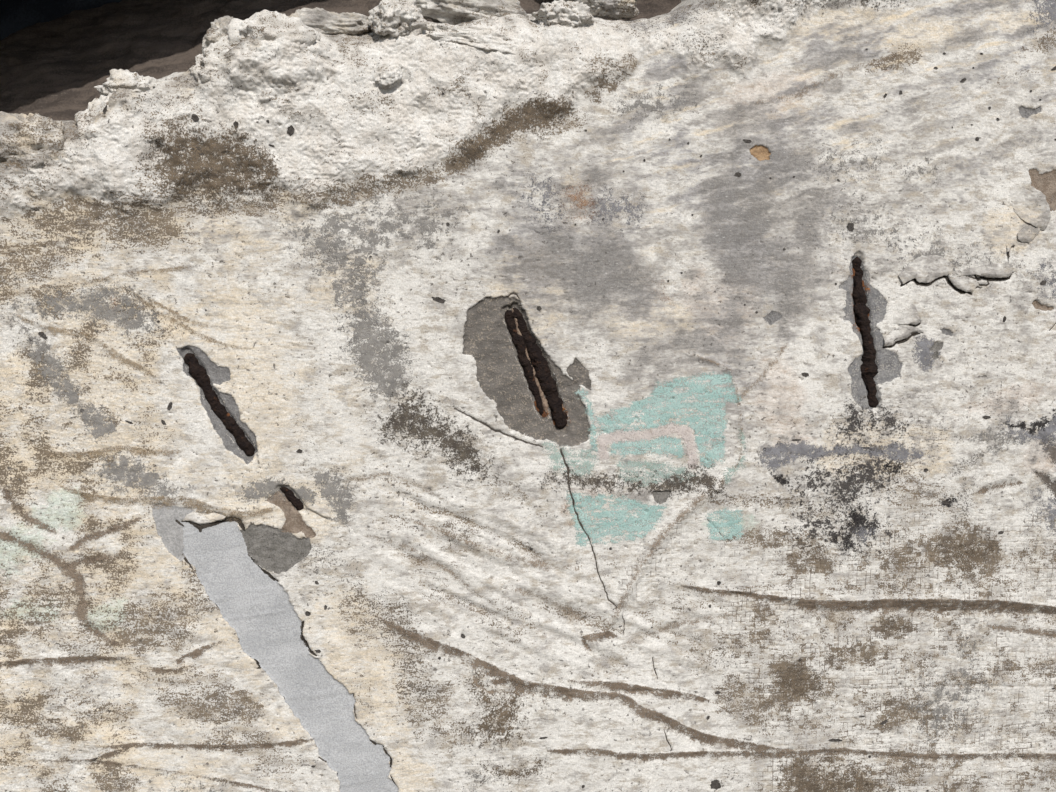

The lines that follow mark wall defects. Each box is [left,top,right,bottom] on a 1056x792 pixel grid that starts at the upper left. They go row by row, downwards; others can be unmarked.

spalling [743,139,771,161]
peeling [898,169,1056,292]
spalling [177,345,258,464]
spalling [463,296,591,446]
spalling [835,255,921,410]
spalling [152,503,226,561]
spalling [240,487,331,574]